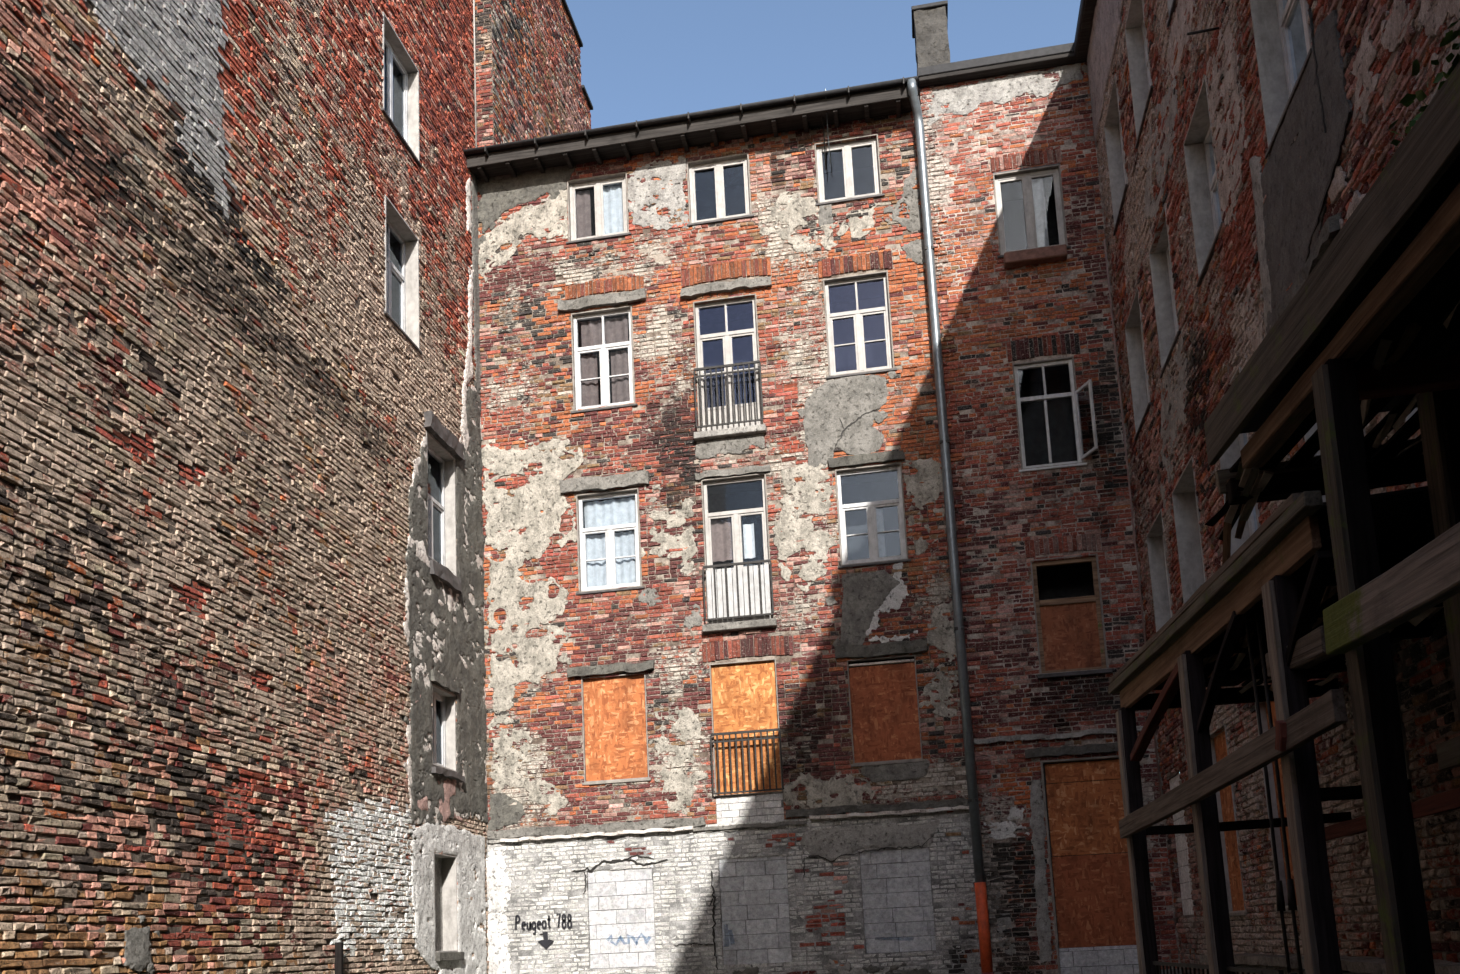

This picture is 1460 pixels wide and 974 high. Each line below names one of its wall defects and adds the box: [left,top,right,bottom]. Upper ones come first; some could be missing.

peeling [1349,0,1460,127]
leakage [233,229,289,302]
peeling [627,156,698,231]
peeling [758,165,926,265]
peeling [323,164,585,974]
peeling [638,485,702,652]
peeling [866,457,969,718]
peeling [649,706,709,814]
crack [573,855,668,894]